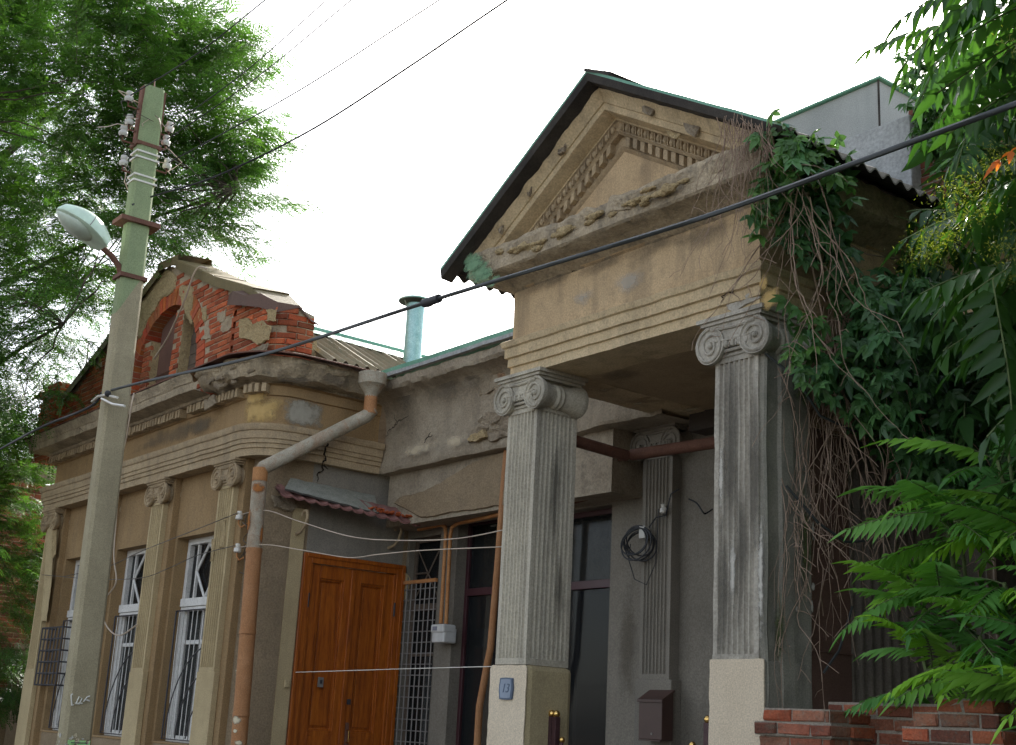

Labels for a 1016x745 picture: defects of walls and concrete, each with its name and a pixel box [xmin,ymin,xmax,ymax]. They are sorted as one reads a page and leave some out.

peeling [137,270,277,350]
flaking render [467,411,508,443]
crack [317,443,329,481]